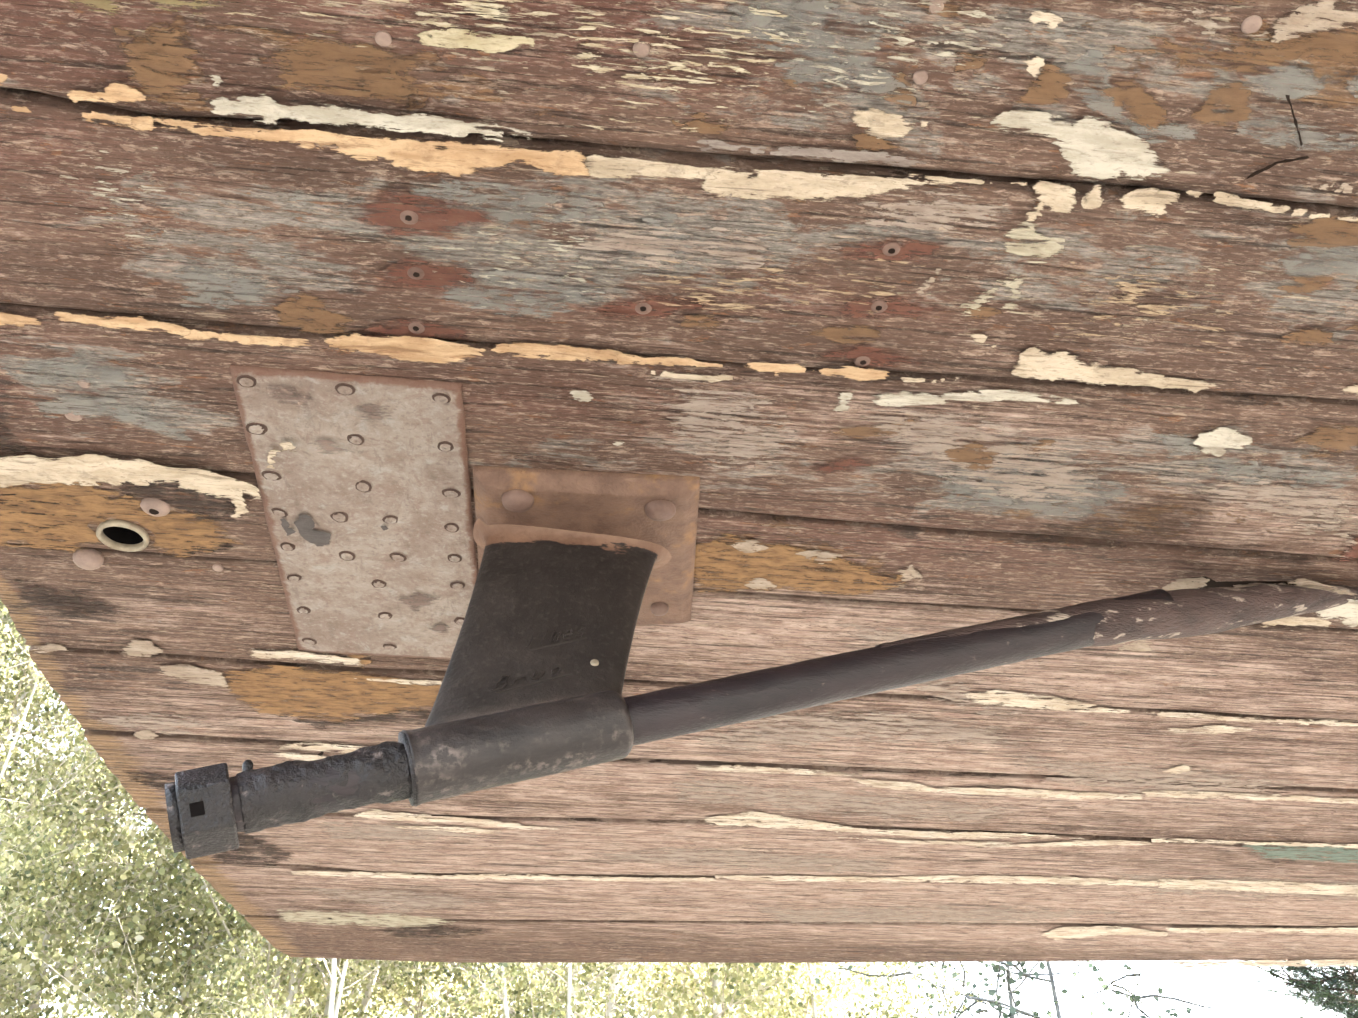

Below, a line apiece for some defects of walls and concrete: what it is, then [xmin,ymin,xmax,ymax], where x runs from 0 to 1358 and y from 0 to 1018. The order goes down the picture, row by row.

peeling [67,0,1358,249]
peeling [0,259,1238,439]
peeling [1193,427,1253,457]
peeling [0,454,261,558]
peeling [694,534,923,596]
peeling [1233,578,1358,628]
peeling [122,640,443,722]
peeling [962,690,1358,735]
peeling [273,742,367,761]
peeling [354,809,558,834]
peeling [704,811,1358,849]
peeling [1042,926,1358,940]